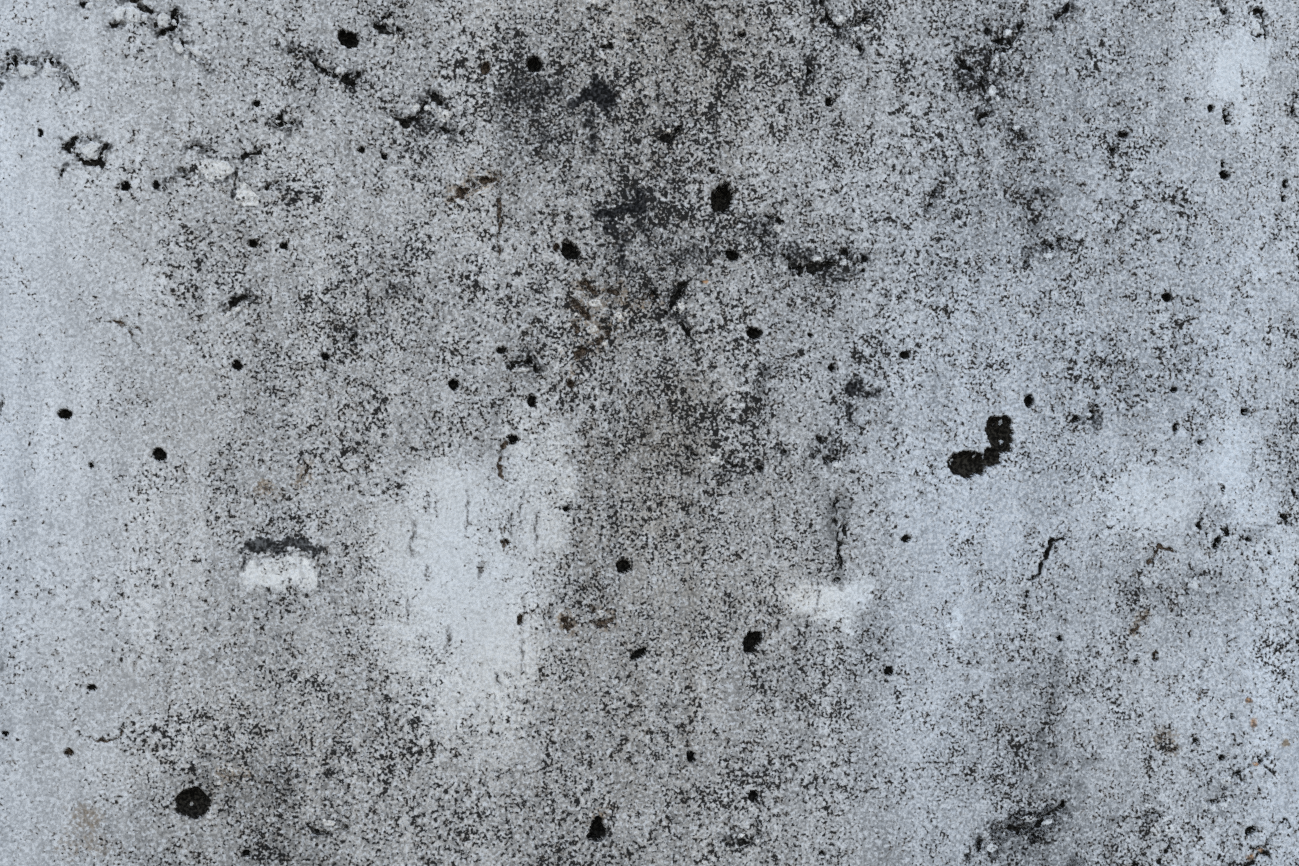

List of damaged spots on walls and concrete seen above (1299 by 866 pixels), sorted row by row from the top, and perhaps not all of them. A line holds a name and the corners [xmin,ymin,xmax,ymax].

crack [0,395,11,425]
crack [1024,533,1075,601]